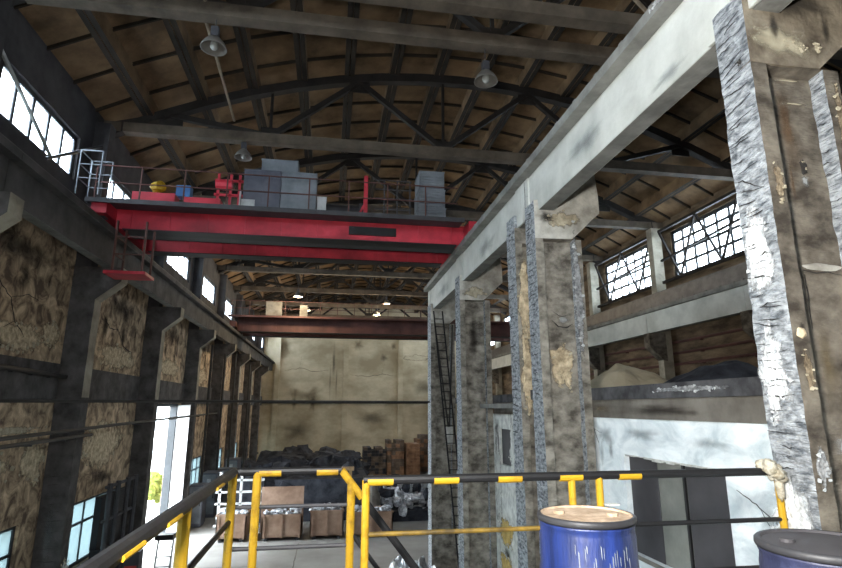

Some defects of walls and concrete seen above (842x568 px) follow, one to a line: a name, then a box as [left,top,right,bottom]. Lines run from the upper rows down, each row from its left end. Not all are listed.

peeling [783,39,822,53]
peeling [545,210,585,393]
crack [715,10,794,469]